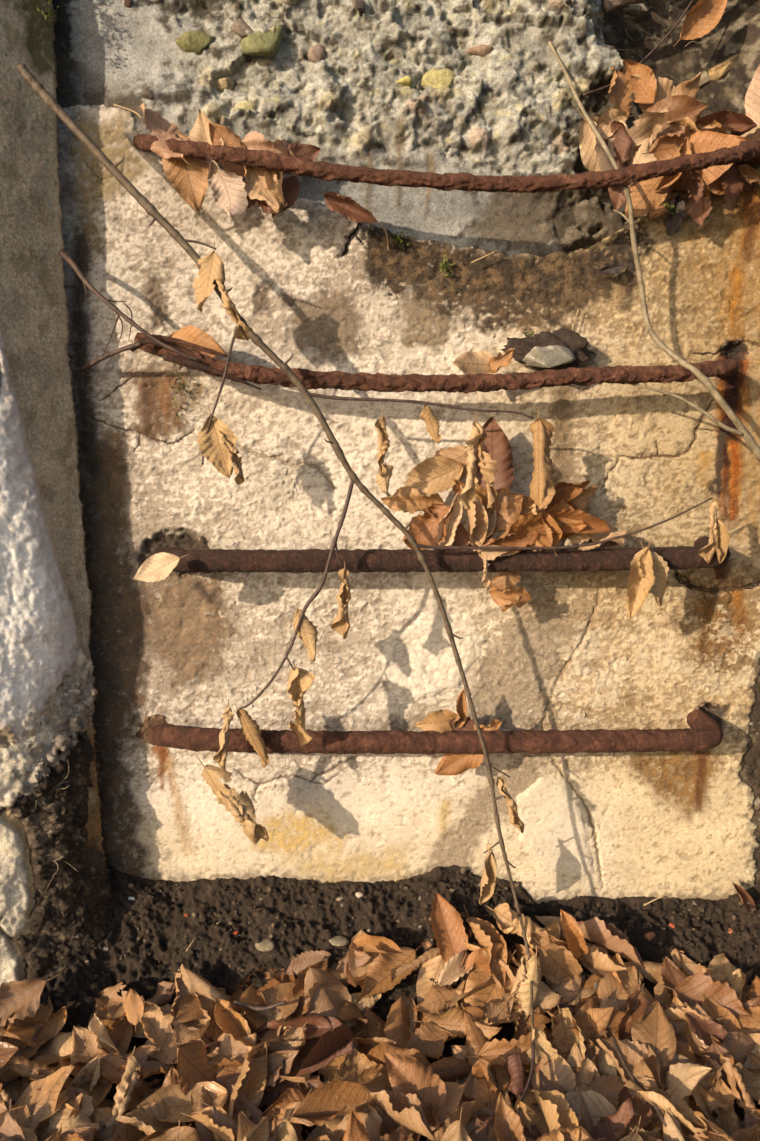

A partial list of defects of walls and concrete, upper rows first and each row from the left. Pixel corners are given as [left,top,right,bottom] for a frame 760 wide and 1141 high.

spalling [52,0,624,176]
spalling [282,174,640,257]
rust [699,178,760,335]
peeling [354,282,497,366]
rust [124,332,261,439]
crack [601,400,719,488]
rust [701,349,760,519]
crack [675,569,760,603]
peeling [487,620,631,727]
peeling [679,605,760,721]
crack [541,576,603,888]
rust [634,750,719,817]